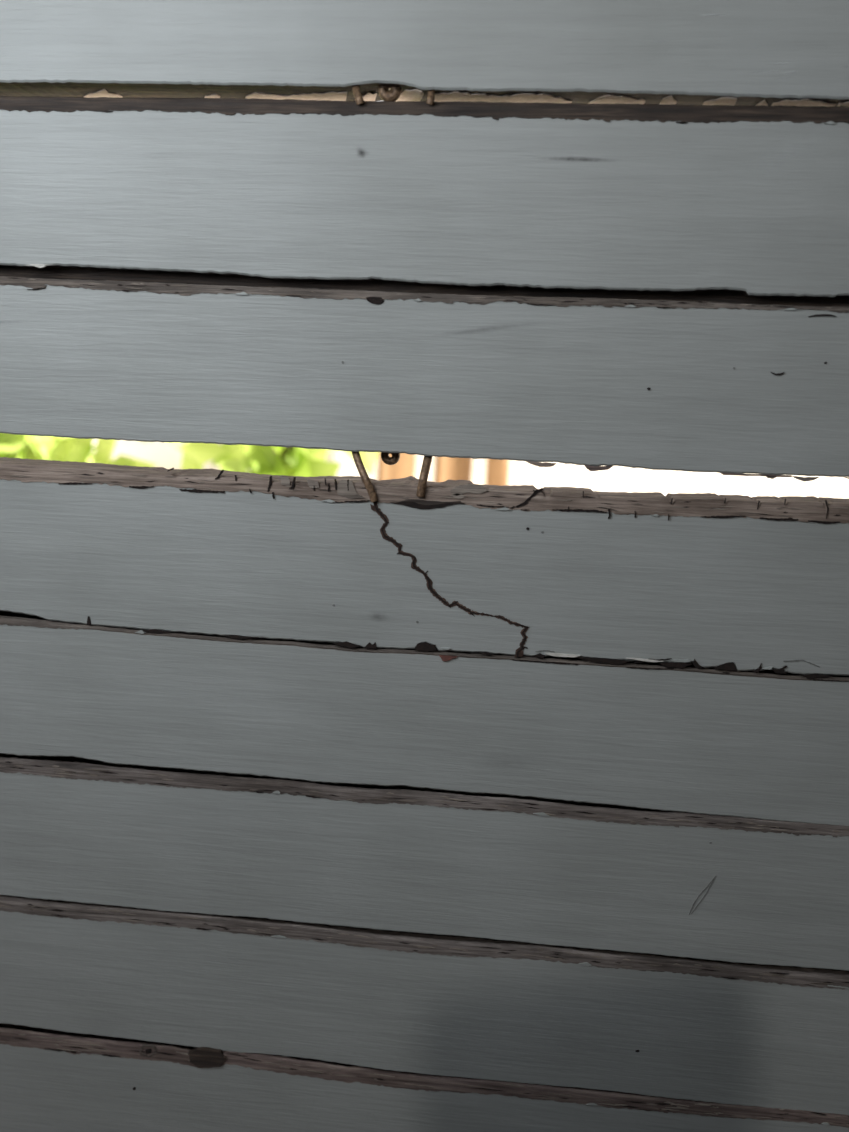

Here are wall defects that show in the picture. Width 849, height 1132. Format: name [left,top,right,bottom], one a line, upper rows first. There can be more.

crack [215,470,529,658]
peeling [0,1031,849,1128]